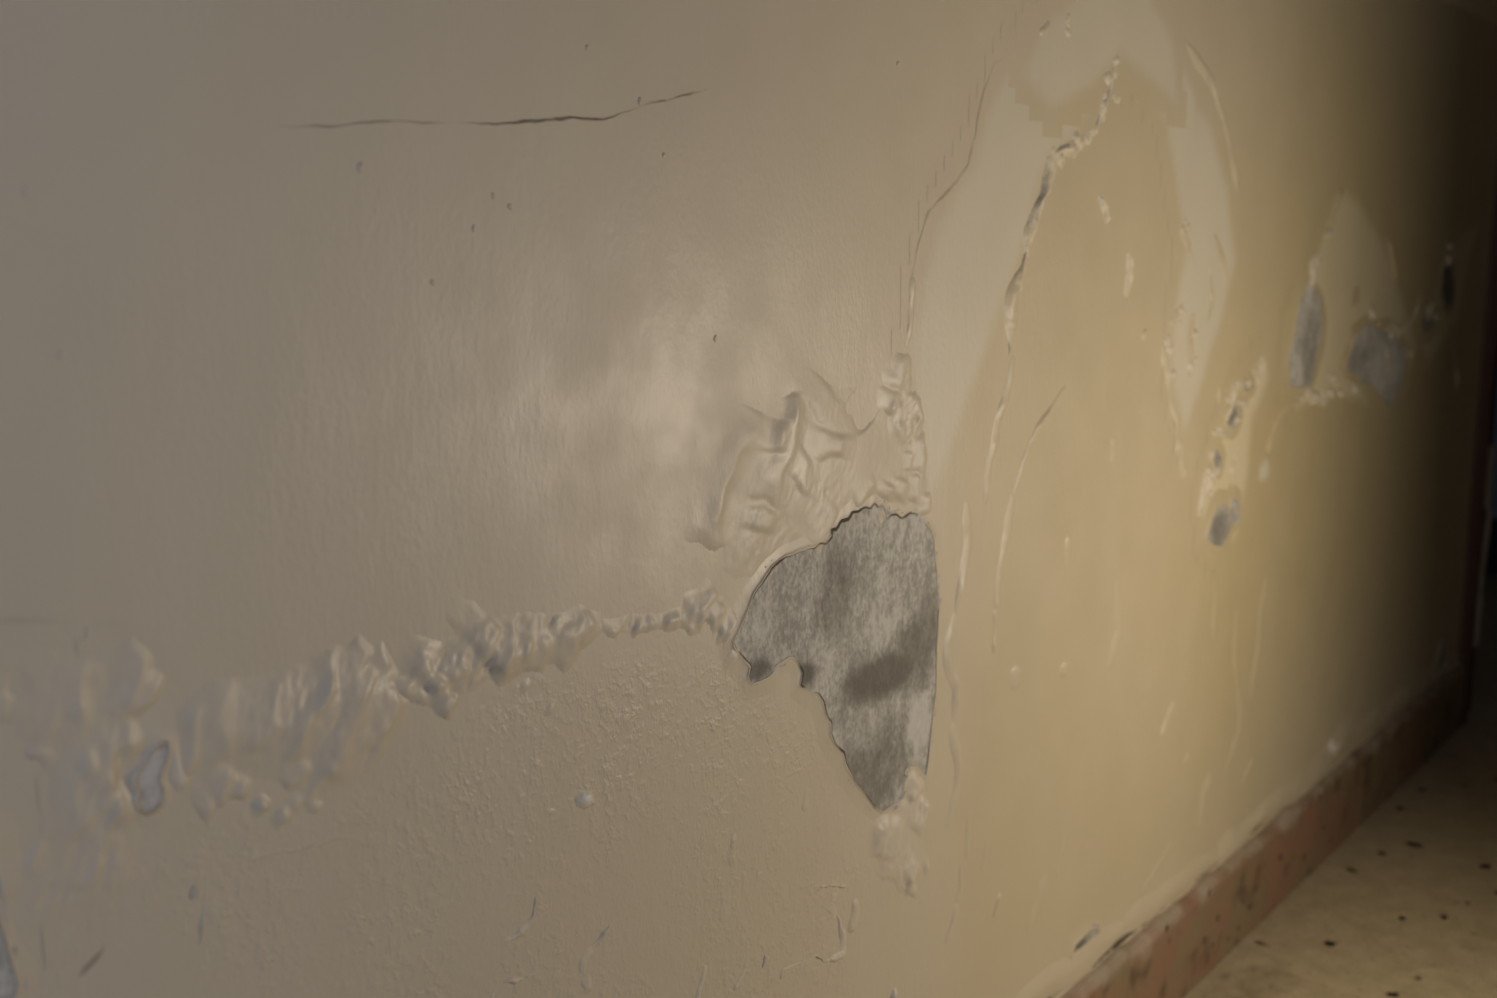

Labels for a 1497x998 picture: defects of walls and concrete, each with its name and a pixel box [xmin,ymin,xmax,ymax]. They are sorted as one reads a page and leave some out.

crack [513,116,602,124]
leakage [891,0,1487,579]
flaking render [1198,262,1327,560]
flaking render [717,494,948,821]